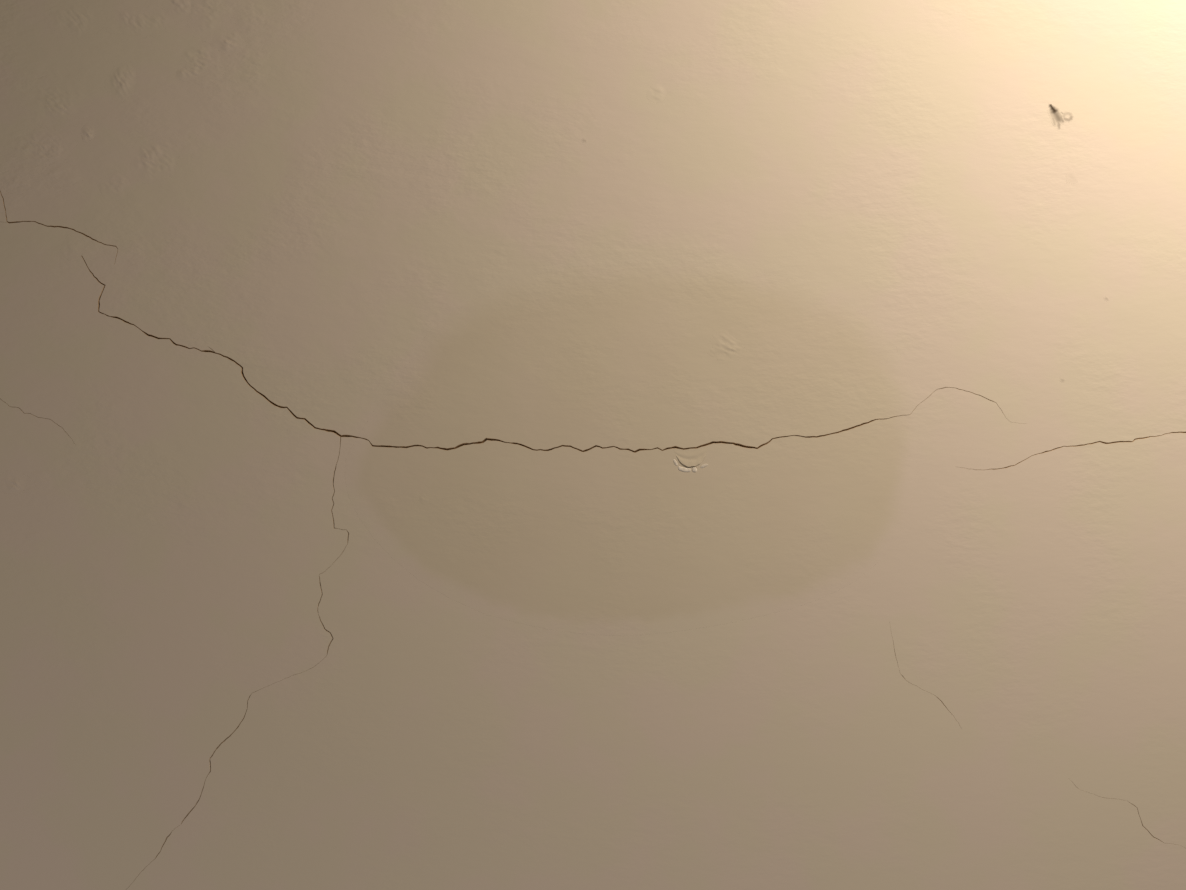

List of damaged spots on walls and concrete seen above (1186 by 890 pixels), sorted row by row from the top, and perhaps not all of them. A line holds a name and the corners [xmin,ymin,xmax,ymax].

crack [0,191,1025,888]
water stain [345,261,919,636]
crack [960,432,1186,470]